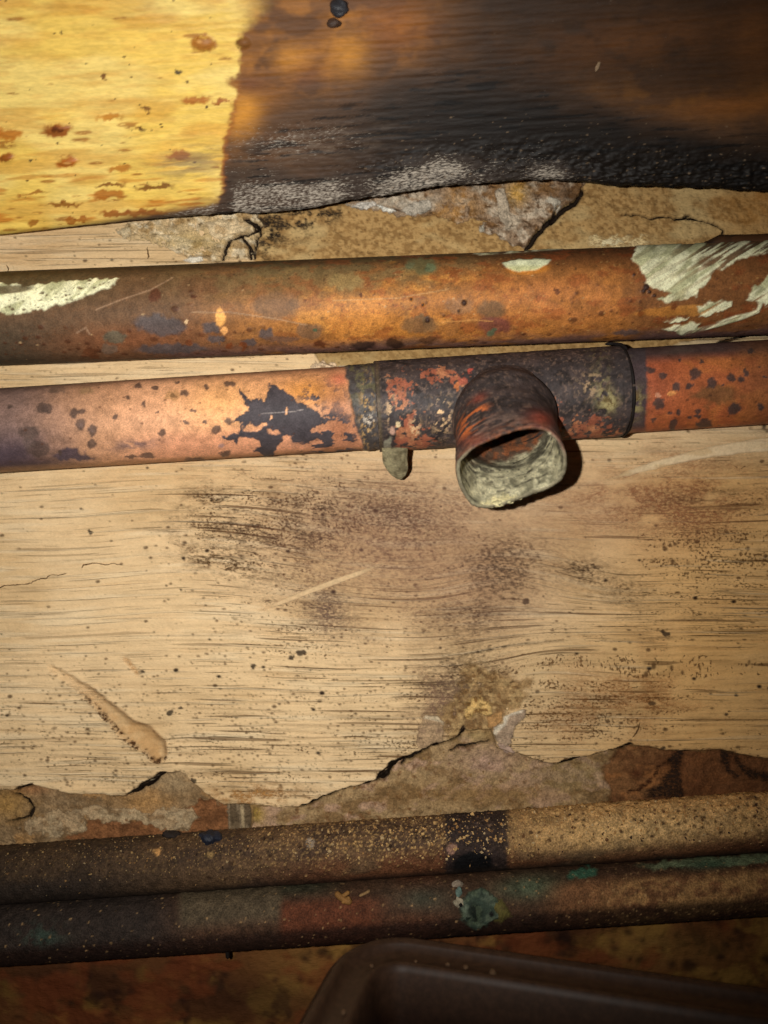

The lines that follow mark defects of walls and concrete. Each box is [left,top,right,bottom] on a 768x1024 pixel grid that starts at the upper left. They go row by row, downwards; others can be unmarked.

flaking render [116,212,263,263]
crack [223,219,262,259]
flaking render [345,179,586,248]
crack [525,191,583,250]
flaking render [0,699,229,845]
crack [128,771,166,794]
crack [302,727,489,806]
flaking render [252,663,768,828]